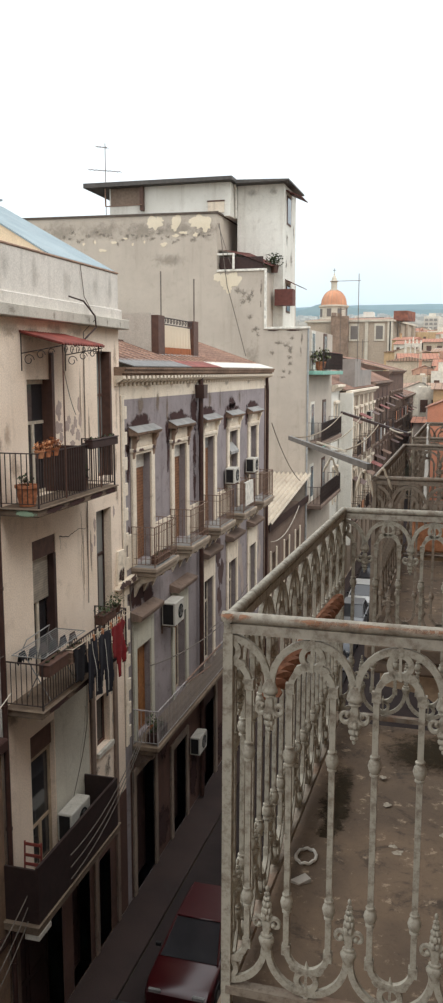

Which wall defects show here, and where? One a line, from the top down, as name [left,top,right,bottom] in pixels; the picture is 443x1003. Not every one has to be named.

flaking render [147,214,211,247]